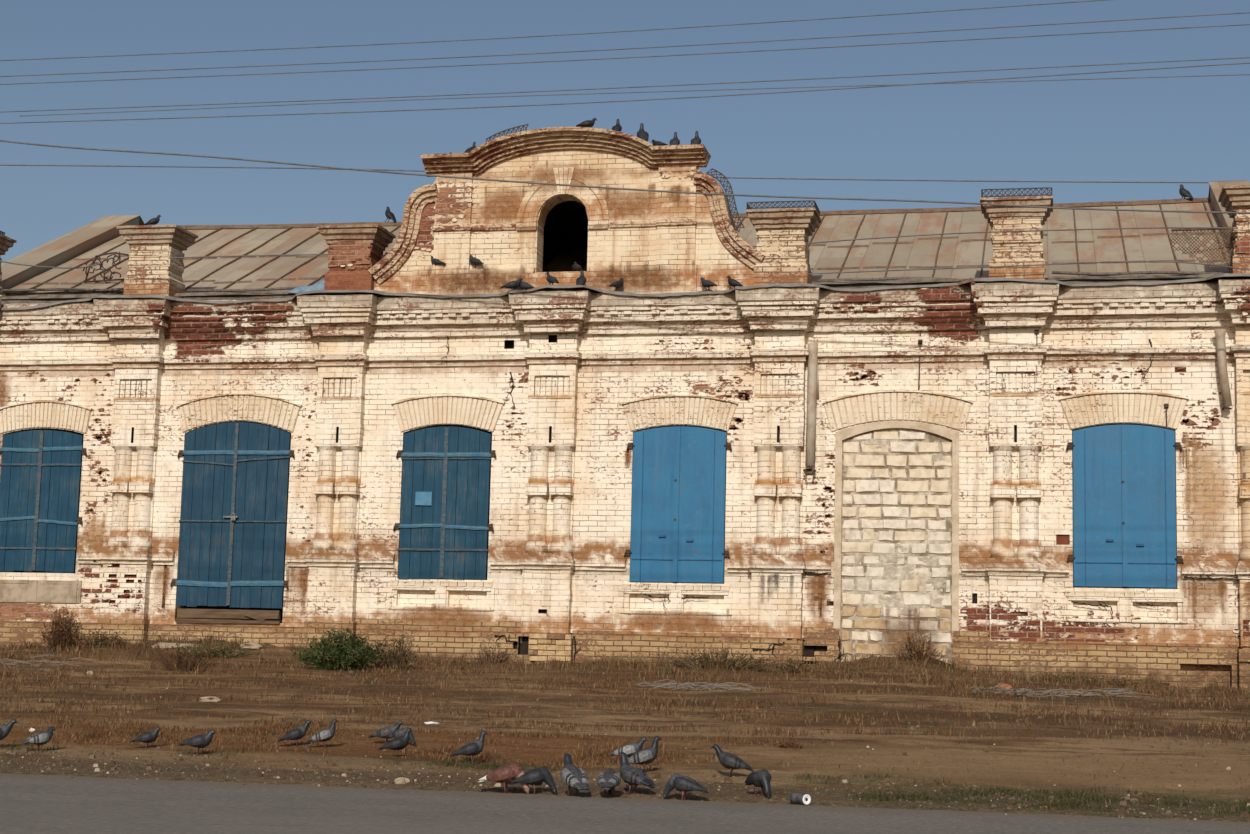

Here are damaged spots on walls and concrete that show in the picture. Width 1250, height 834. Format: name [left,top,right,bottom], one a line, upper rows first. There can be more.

peeling [414,181,473,251]
peeling [145,295,301,362]
peeling [840,292,883,312]
peeling [909,276,985,345]
peeling [1229,286,1250,322]
peeling [0,370,113,543]
peeling [0,560,145,622]
peeling [960,600,1141,643]
peeling [1233,620,1250,642]